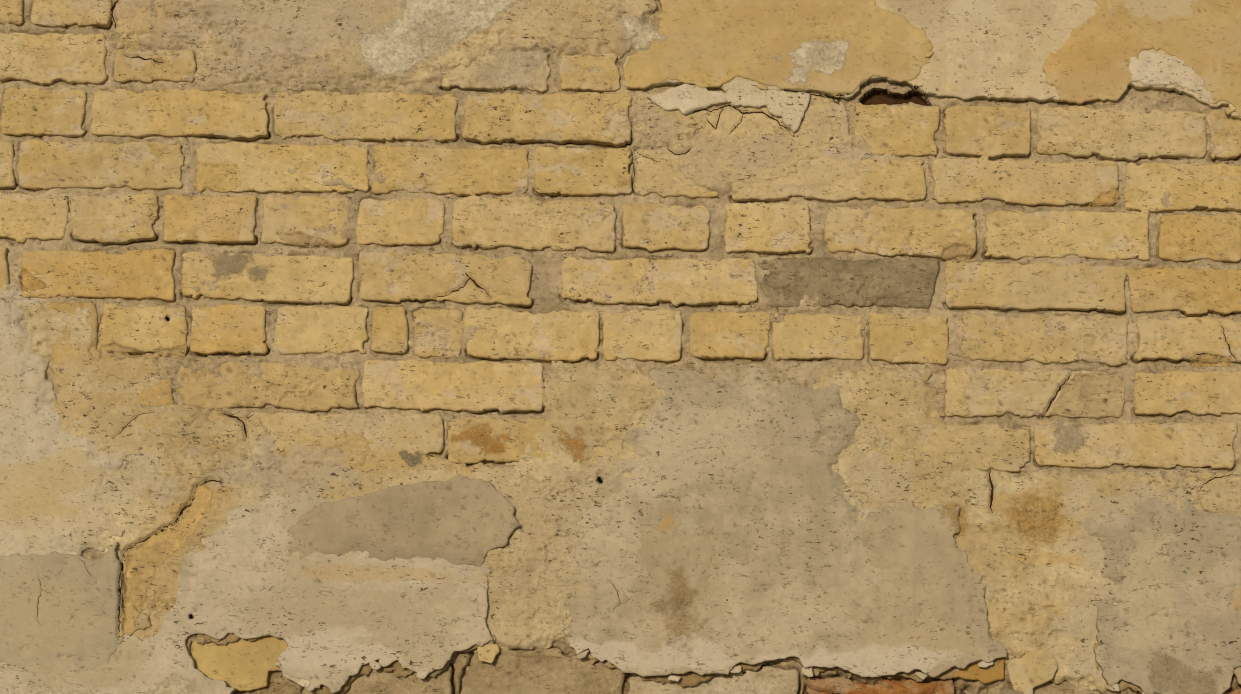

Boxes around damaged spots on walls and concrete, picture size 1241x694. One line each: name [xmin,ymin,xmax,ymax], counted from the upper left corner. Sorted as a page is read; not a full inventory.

spalling [112,0,1241,199]
spalling [1086,188,1119,209]
spalling [276,231,341,250]
spalling [760,242,977,309]
peeling [0,266,1241,694]